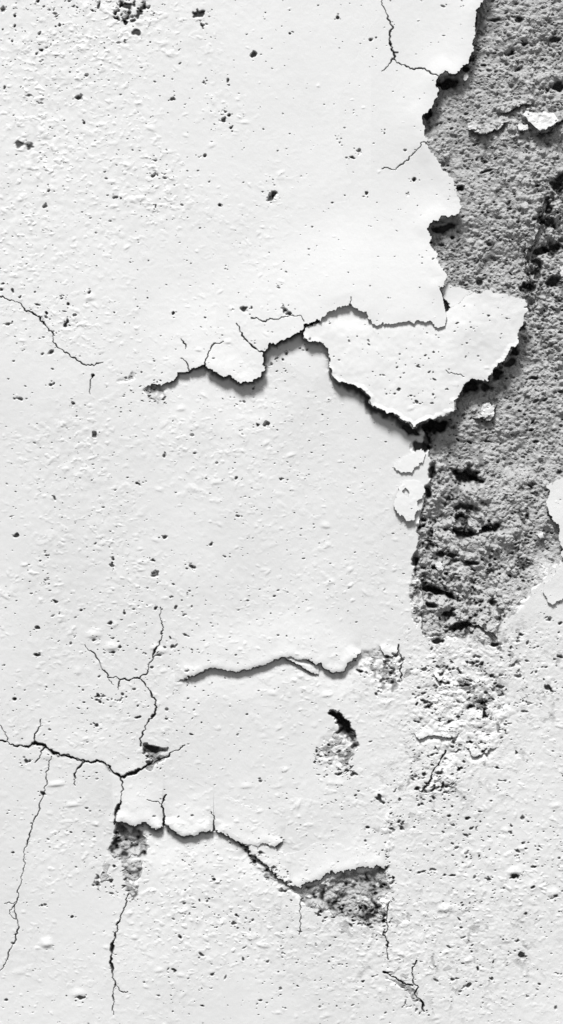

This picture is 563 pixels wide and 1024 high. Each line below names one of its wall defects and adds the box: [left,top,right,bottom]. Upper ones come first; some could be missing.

crack [380,0,440,81]
crack [0,295,105,395]
spalling [105,0,563,799]
crack [0,606,186,974]
peeling [17,706,401,925]
crack [208,810,216,833]
crack [108,892,130,1017]
crack [297,897,305,936]